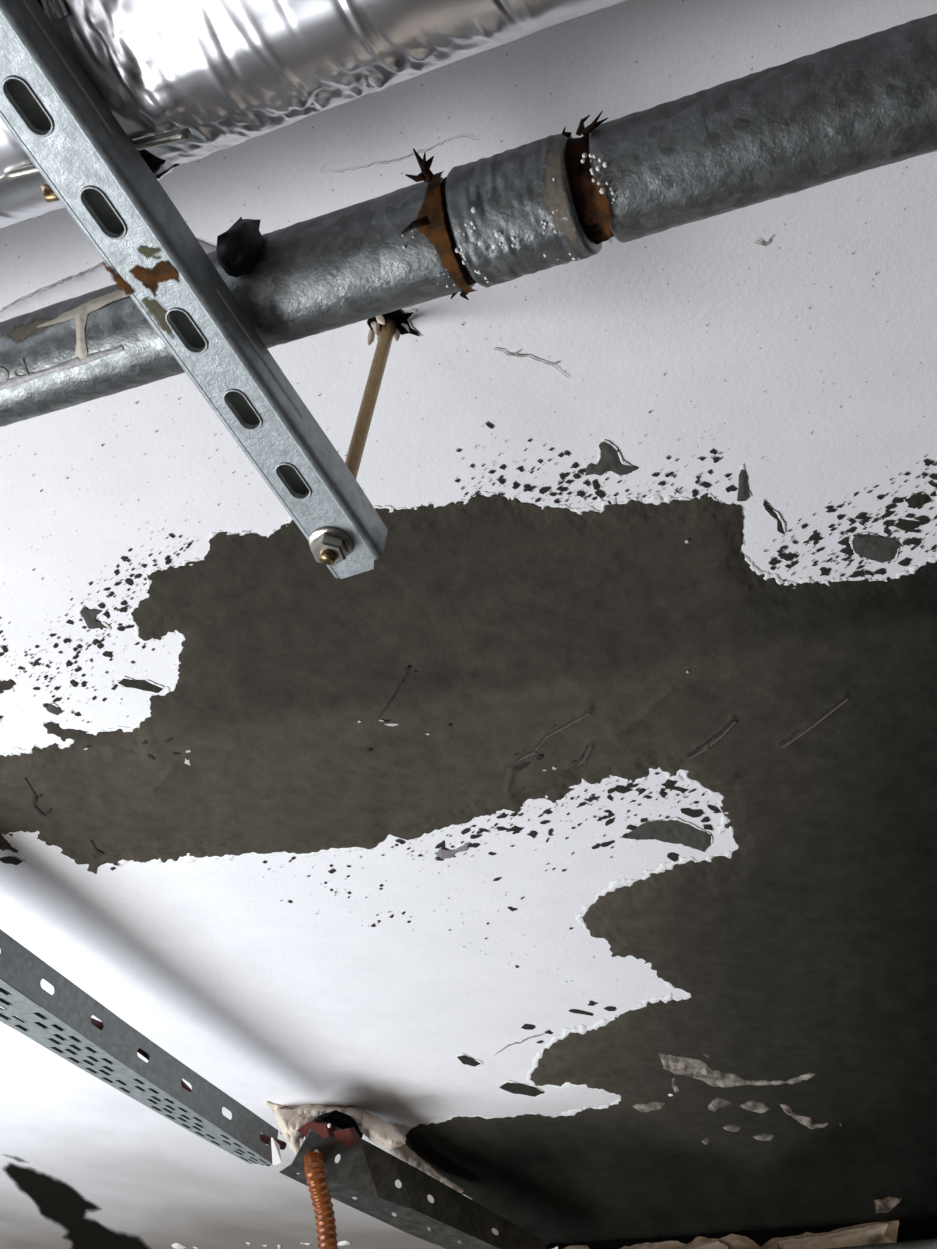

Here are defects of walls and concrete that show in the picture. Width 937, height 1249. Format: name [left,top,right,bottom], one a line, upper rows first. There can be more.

crack [493,348,569,378]
flaking render [0,422,937,1249]